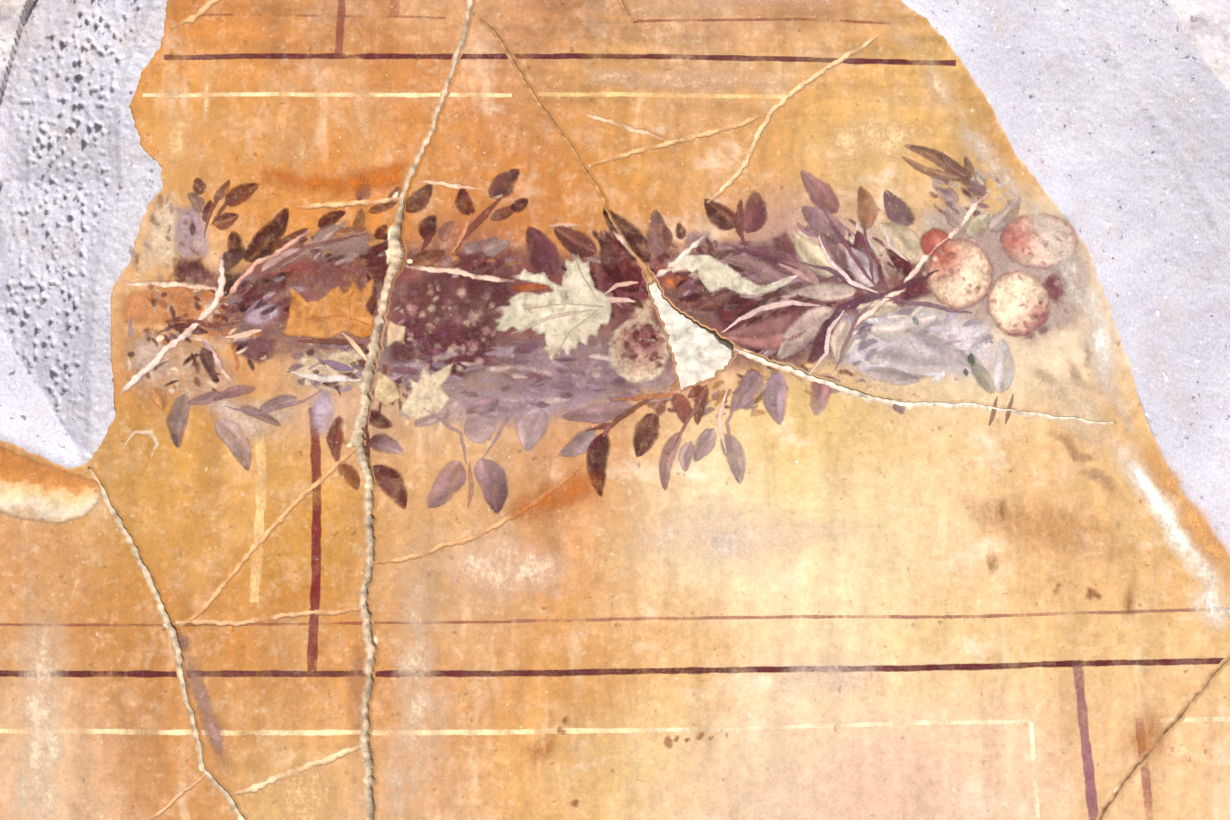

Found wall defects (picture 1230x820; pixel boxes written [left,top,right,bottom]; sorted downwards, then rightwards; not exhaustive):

peeling [927,69,951,99]
crack [88,0,876,820]
flaking render [641,264,737,393]
crack [854,196,987,328]
crack [733,345,1114,426]
peeling [1035,209,1114,390]
peeling [0,447,100,523]
peeling [1124,457,1224,622]
crack [1096,653,1230,820]